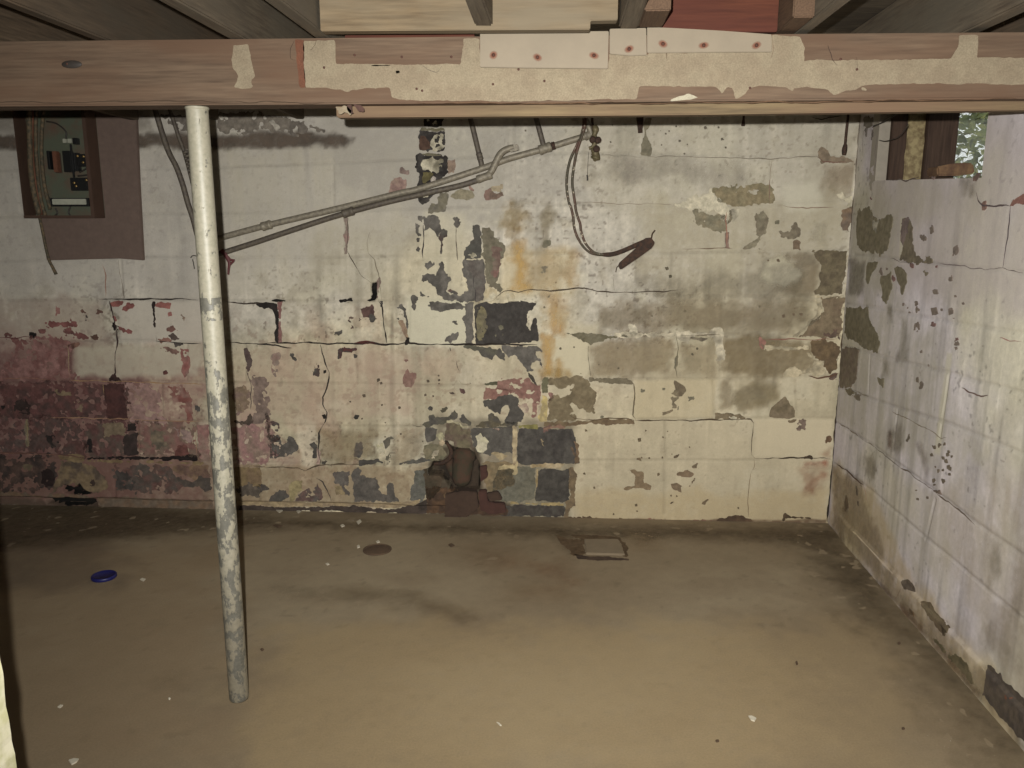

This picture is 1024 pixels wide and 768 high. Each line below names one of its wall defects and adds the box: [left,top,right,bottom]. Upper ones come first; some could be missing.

leakage [674,188,731,222]
peeling [0,383,139,506]
peeling [152,301,185,355]
peeling [234,348,323,513]
crack [226,218,537,498]
peeling [332,189,645,518]
crack [498,279,674,296]
peeling [624,446,690,490]
peeling [662,380,695,415]
leakage [604,255,864,407]
peeling [769,397,806,431]
peeling [692,183,965,401]